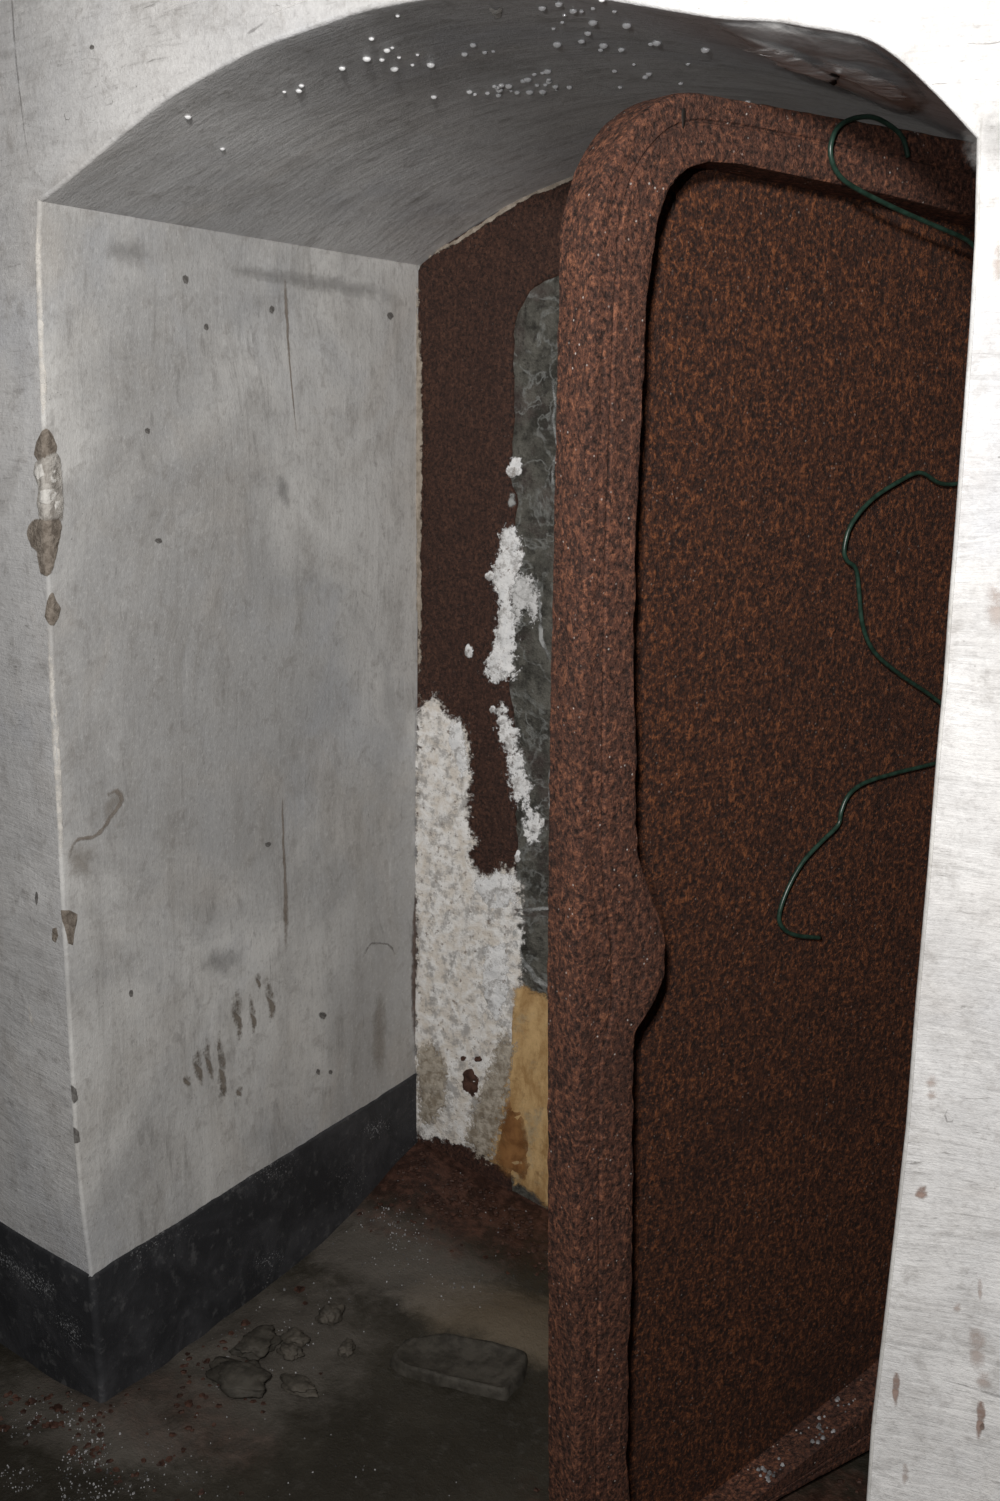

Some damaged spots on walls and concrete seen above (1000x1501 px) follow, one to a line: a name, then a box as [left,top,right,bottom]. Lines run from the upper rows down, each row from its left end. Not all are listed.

flaking render [27,229,64,625]
corrosion [976,1380,987,1437]